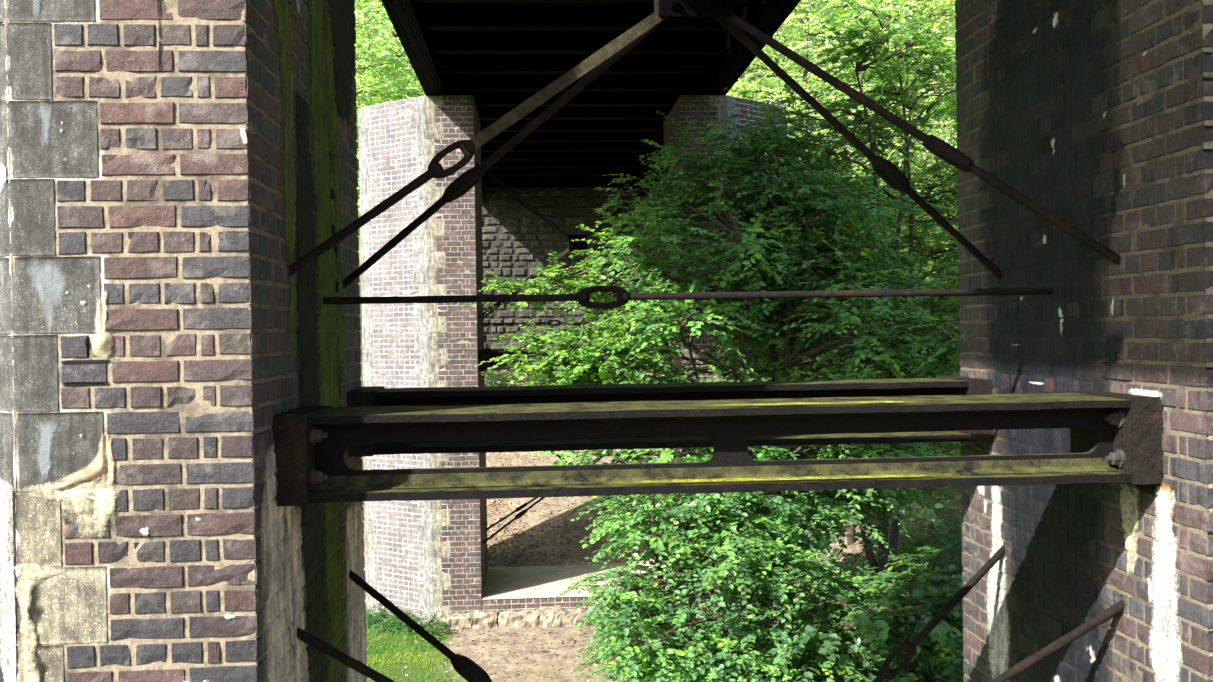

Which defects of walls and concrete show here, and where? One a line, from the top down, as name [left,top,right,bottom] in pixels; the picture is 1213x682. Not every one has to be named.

spalling [29,433,114,496]
damp [0,479,16,682]
damp [978,486,1010,682]
damp [1120,484,1182,682]